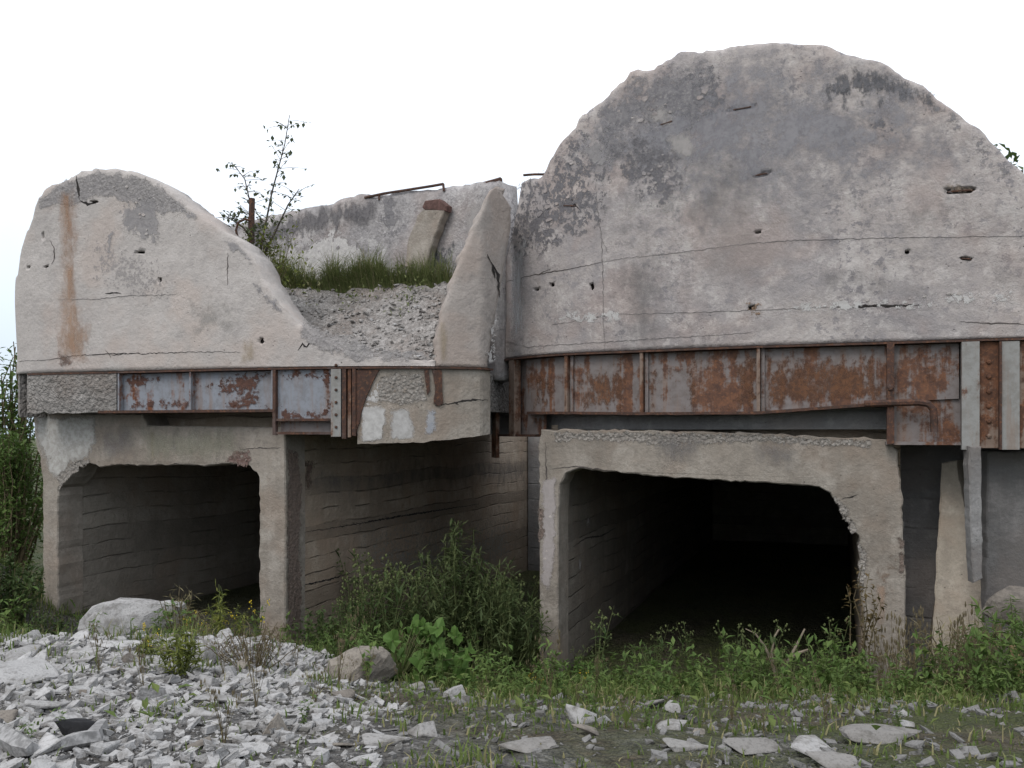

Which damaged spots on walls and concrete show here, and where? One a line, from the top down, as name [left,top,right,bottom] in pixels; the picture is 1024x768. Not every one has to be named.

rust [582,371,625,412]
rust [728,356,882,410]